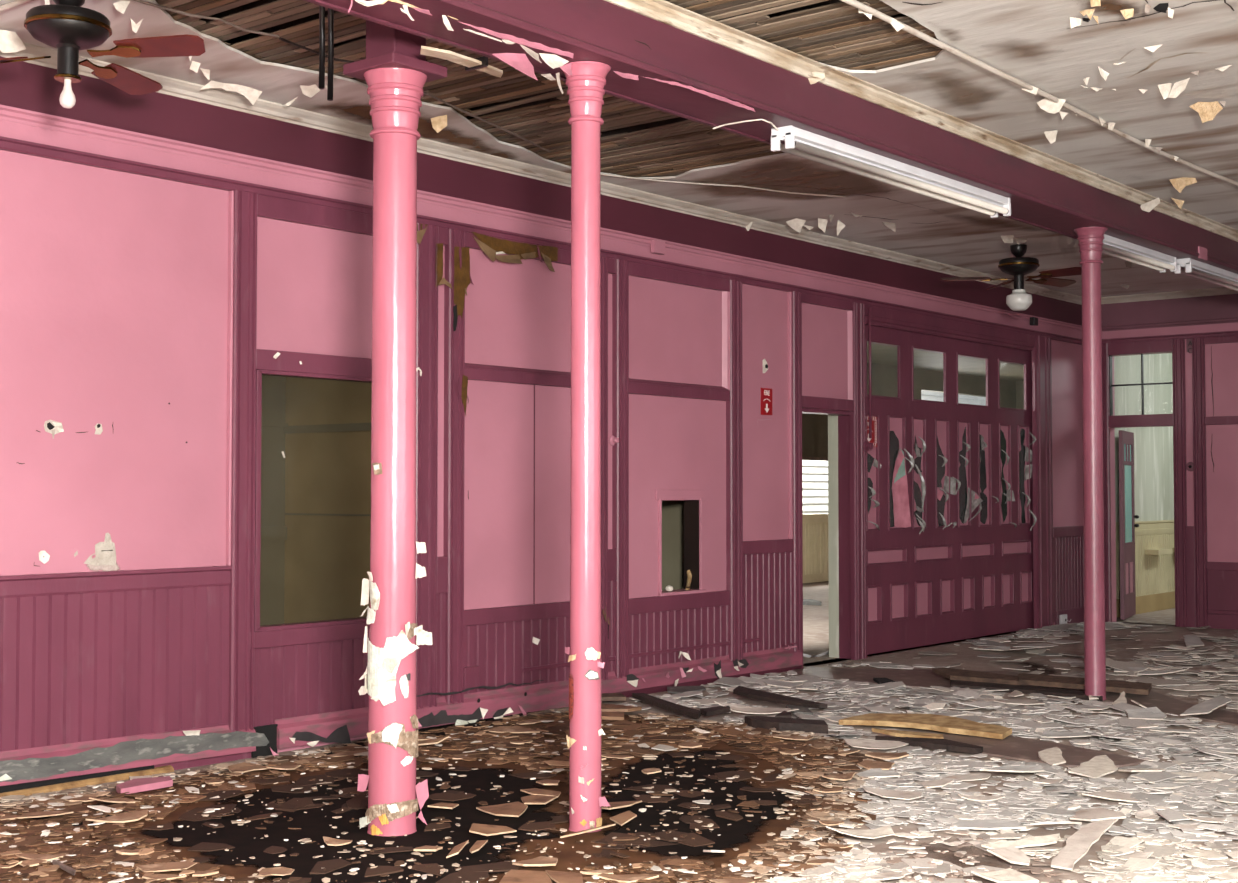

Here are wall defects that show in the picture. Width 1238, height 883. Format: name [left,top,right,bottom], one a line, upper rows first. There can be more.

peeling [348,0,573,94]
crack [1067,0,1235,79]
peeling [189,56,262,105]
peeling [431,115,447,133]
peeling [614,71,755,112]
peeling [1022,85,1077,143]
peeling [417,224,558,331]
peeling [415,541,427,579]
peeling [358,572,432,706]
peeling [565,647,605,681]
peeling [0,730,278,782]
leakage [0,712,865,883]